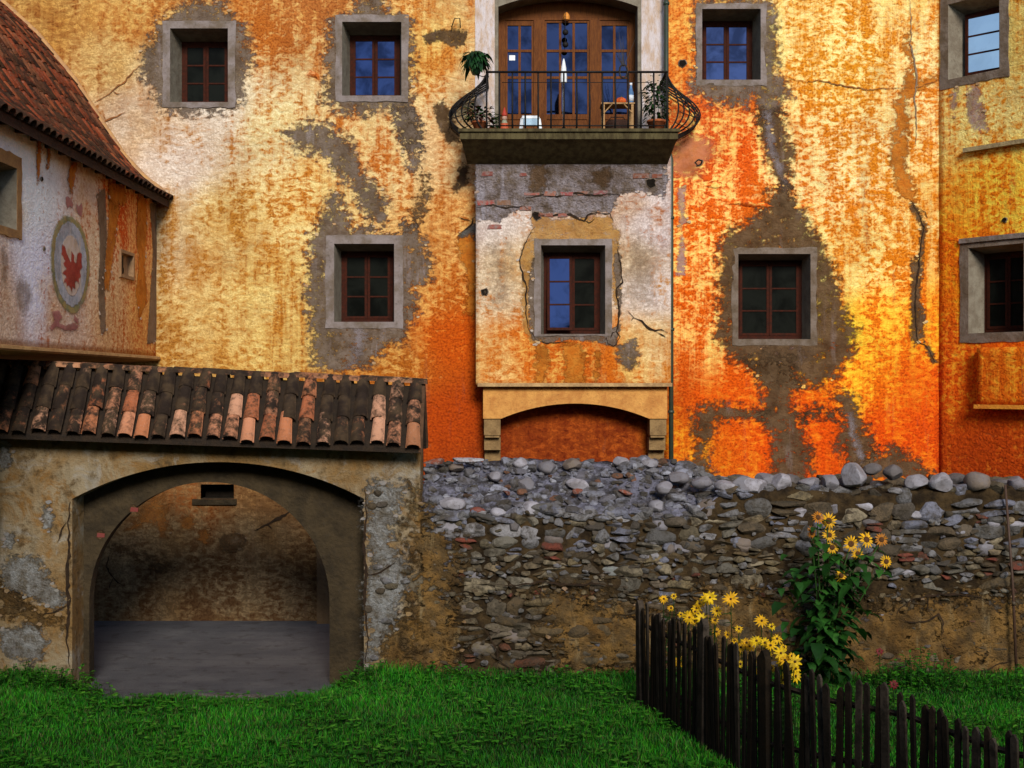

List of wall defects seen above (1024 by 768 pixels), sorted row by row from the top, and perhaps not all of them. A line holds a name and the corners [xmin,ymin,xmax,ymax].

crack [95,65,140,122]
crack [789,6,938,138]
crack [459,192,668,347]
flaking render [458,164,691,346]
crack [911,201,935,362]
flaking render [0,532,70,668]
flaking render [39,500,56,533]
crack [44,503,71,667]
flaking render [358,477,479,675]